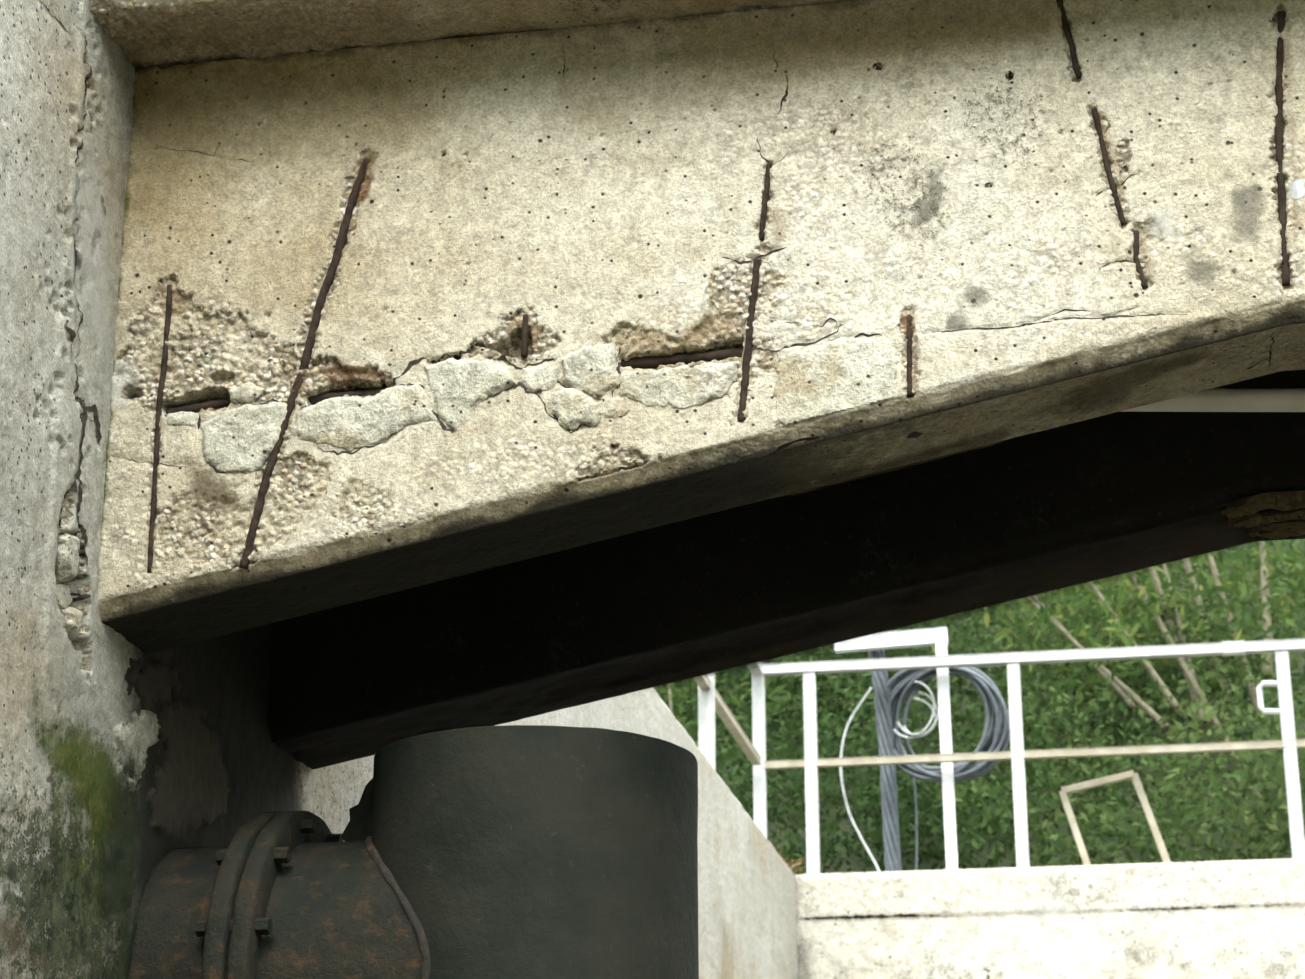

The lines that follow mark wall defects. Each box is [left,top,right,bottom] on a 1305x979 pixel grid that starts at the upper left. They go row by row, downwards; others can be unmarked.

crack [39,0,249,602]
crack [318,432,398,455]
crack [350,343,626,434]
spalling [113,146,922,577]
spalling [55,491,91,674]
leakage [0,783,119,979]